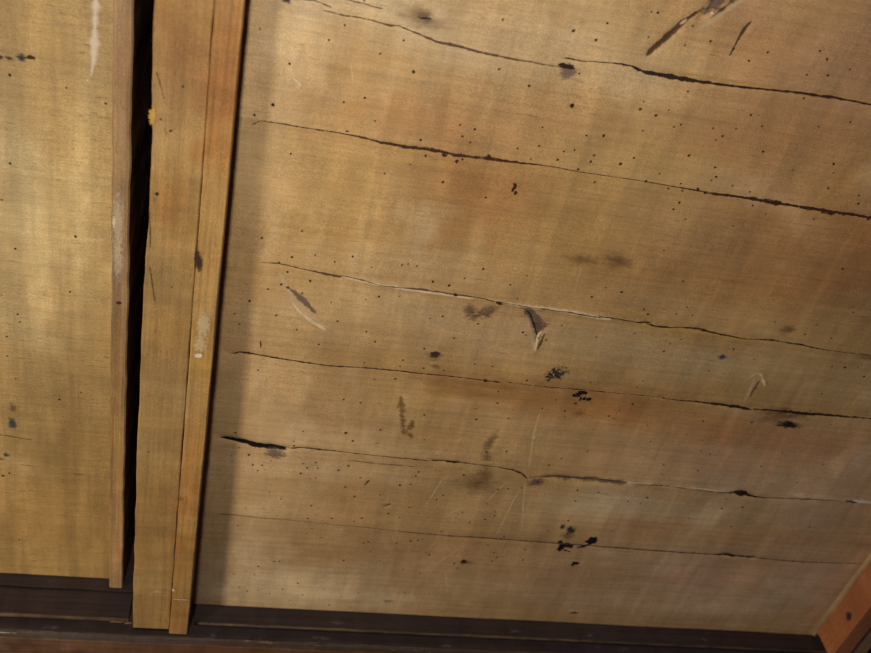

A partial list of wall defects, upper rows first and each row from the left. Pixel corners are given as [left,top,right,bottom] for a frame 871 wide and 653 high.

crack [283,0,871,105]
crack [250,121,871,220]
crack [261,262,866,355]
crack [231,351,871,419]
crack [221,436,871,504]
crack [227,514,856,564]